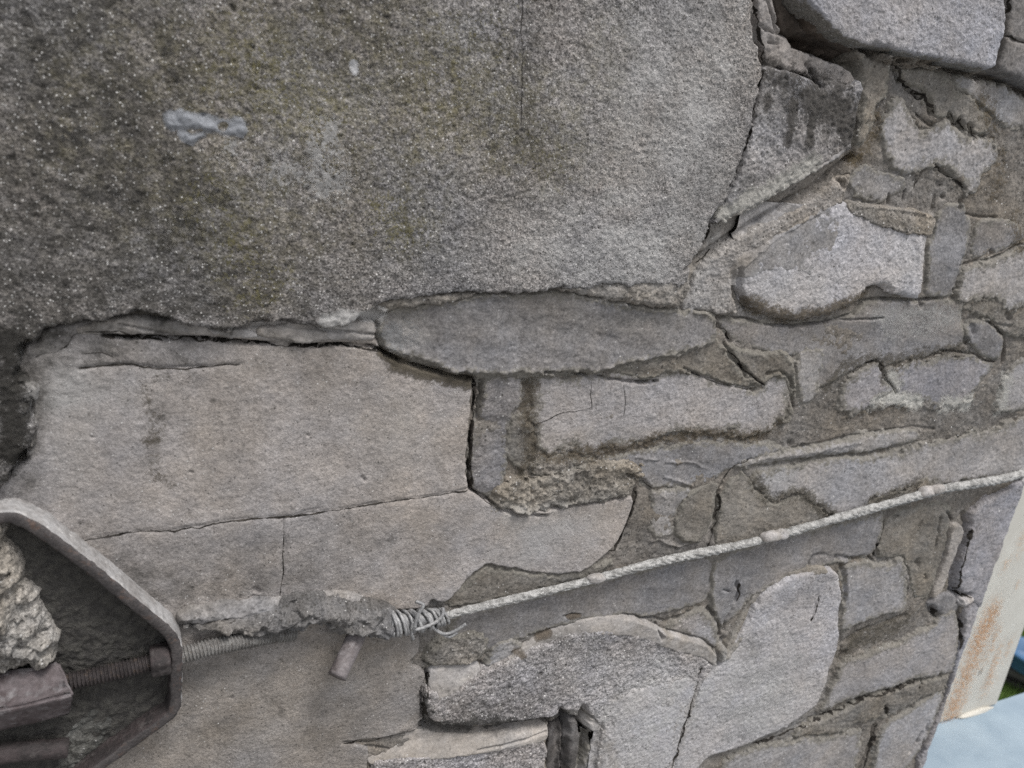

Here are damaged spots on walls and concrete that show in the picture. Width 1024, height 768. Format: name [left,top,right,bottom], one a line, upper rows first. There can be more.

crack [743,0,765,151]
crack [696,222,716,262]
crack [85,377,491,595]
spalling [367,709,600,768]
crack [671,667,702,768]